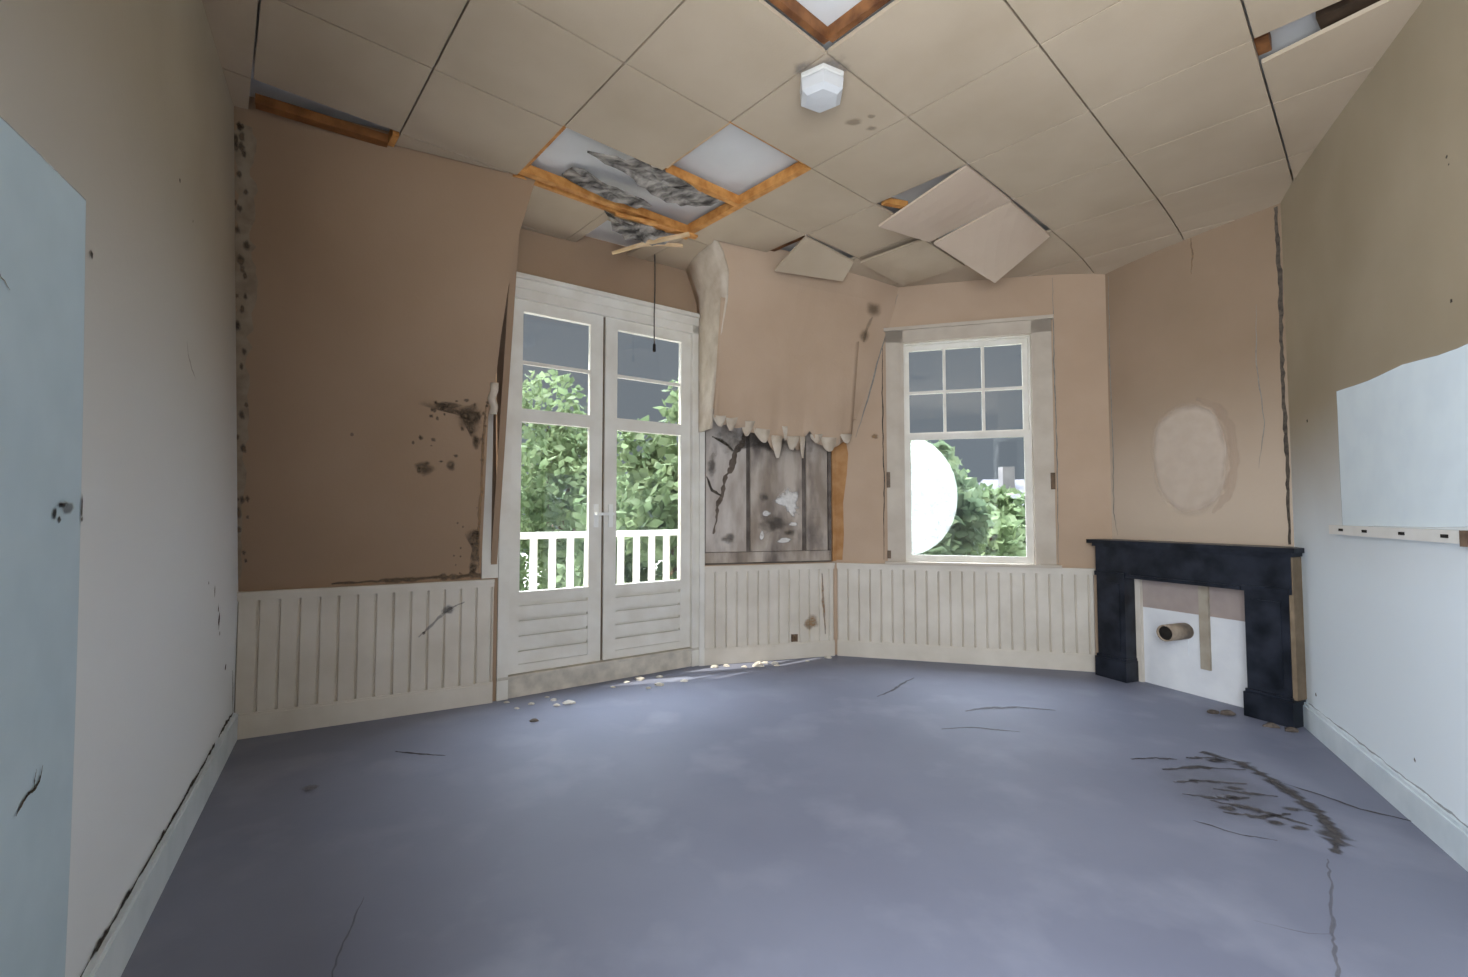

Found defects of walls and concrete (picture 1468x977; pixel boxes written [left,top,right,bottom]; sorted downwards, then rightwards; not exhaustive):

damp [412,436,457,473]
damp [430,399,489,574]
crack [706,433,746,534]
damp [1134,751,1348,854]